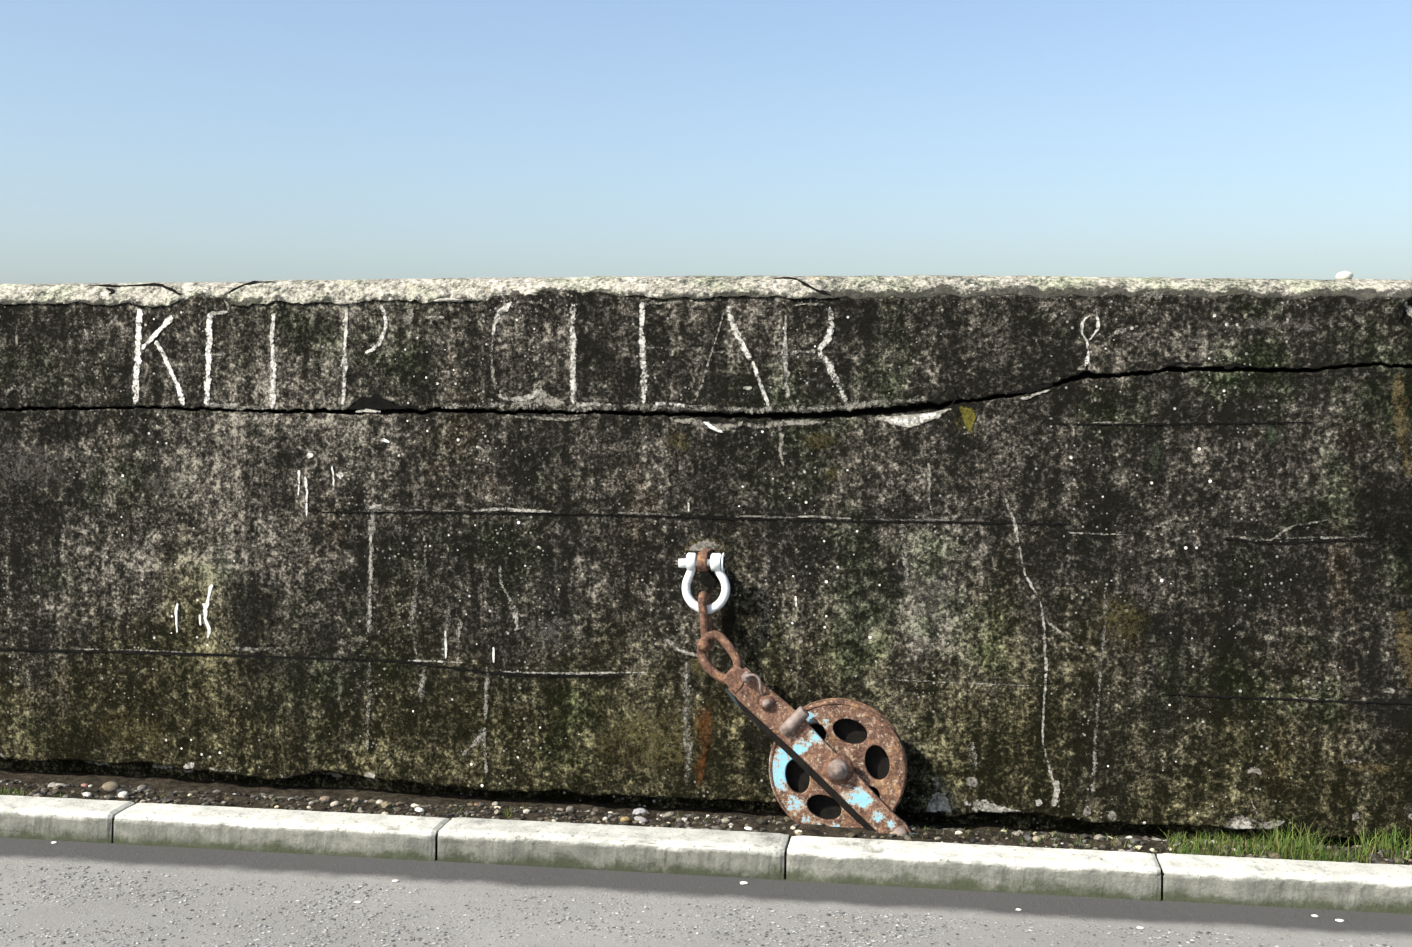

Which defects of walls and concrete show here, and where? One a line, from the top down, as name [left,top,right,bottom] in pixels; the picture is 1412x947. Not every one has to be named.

crack [0,349,1412,444]